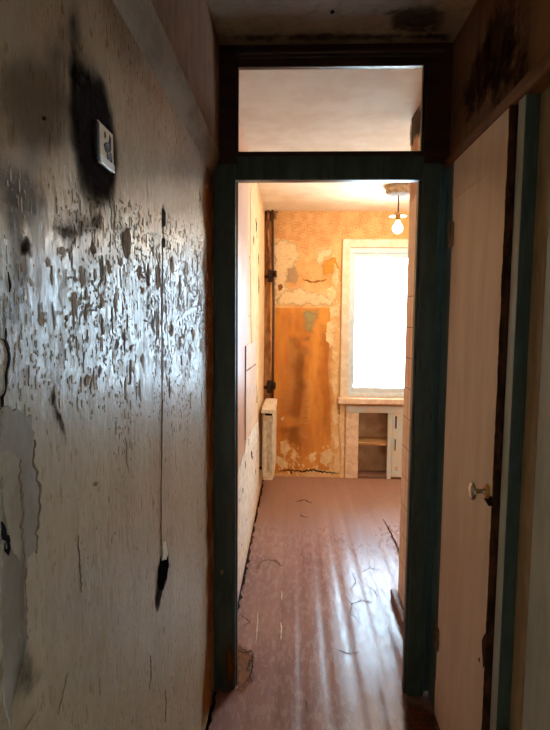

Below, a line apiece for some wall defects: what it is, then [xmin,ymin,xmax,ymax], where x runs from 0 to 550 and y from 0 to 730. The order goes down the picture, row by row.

peeling [0,182,211,728]
peeling [274,239,345,478]
crack [281,467,340,475]